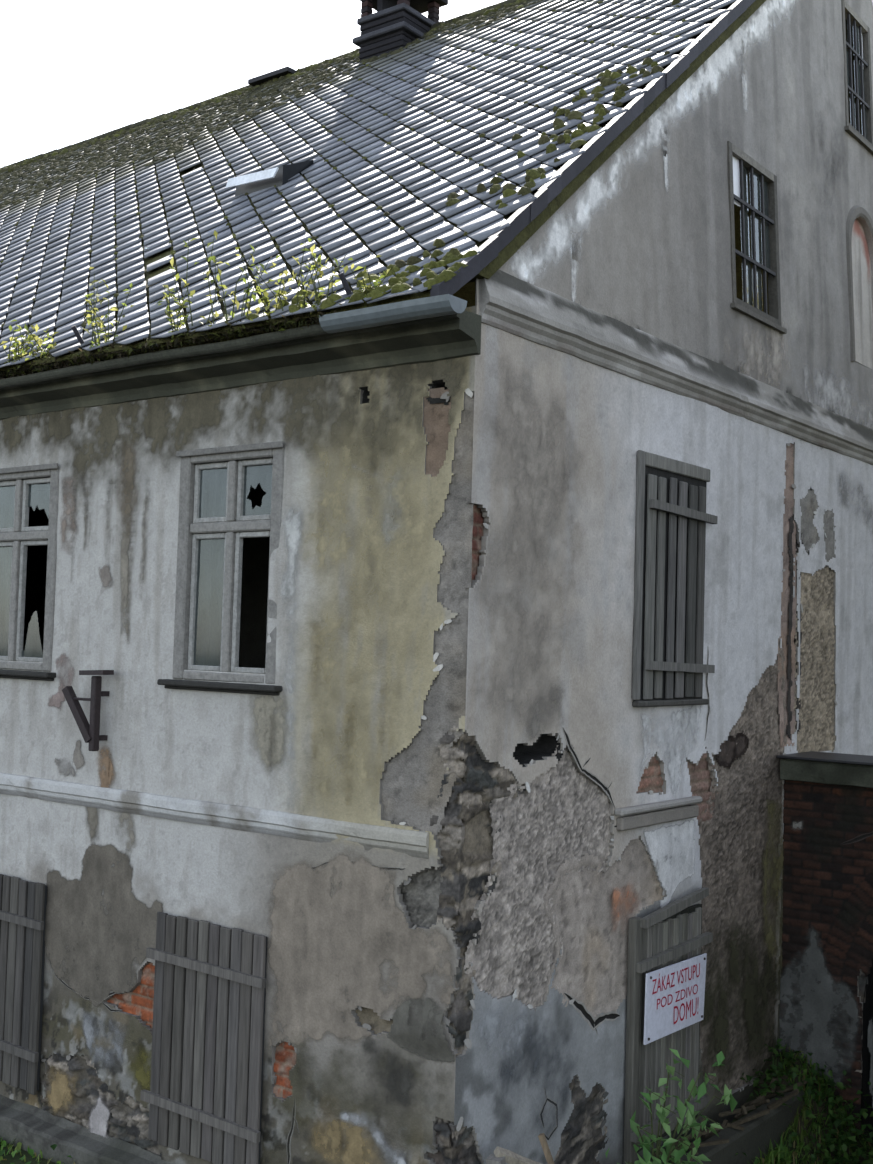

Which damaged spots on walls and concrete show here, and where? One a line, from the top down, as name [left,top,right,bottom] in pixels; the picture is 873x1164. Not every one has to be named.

leakage [512,0,795,302]
leakage [0,358,466,635]
flaking render [382,380,489,835]
leakage [744,329,786,385]
peeling [45,844,163,1028]
peeling [268,734,666,1098]
flaking render [686,484,838,1093]
flaking render [554,1075,609,1164]